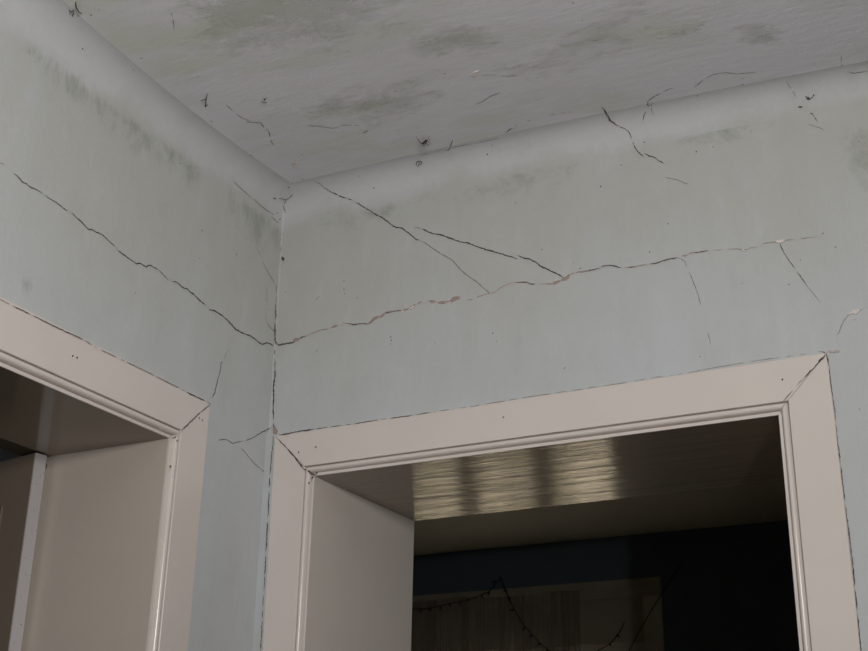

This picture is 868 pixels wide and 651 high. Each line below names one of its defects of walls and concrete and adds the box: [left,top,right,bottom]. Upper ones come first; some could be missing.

crack [602,88,687,184]
crack [0,163,862,651]